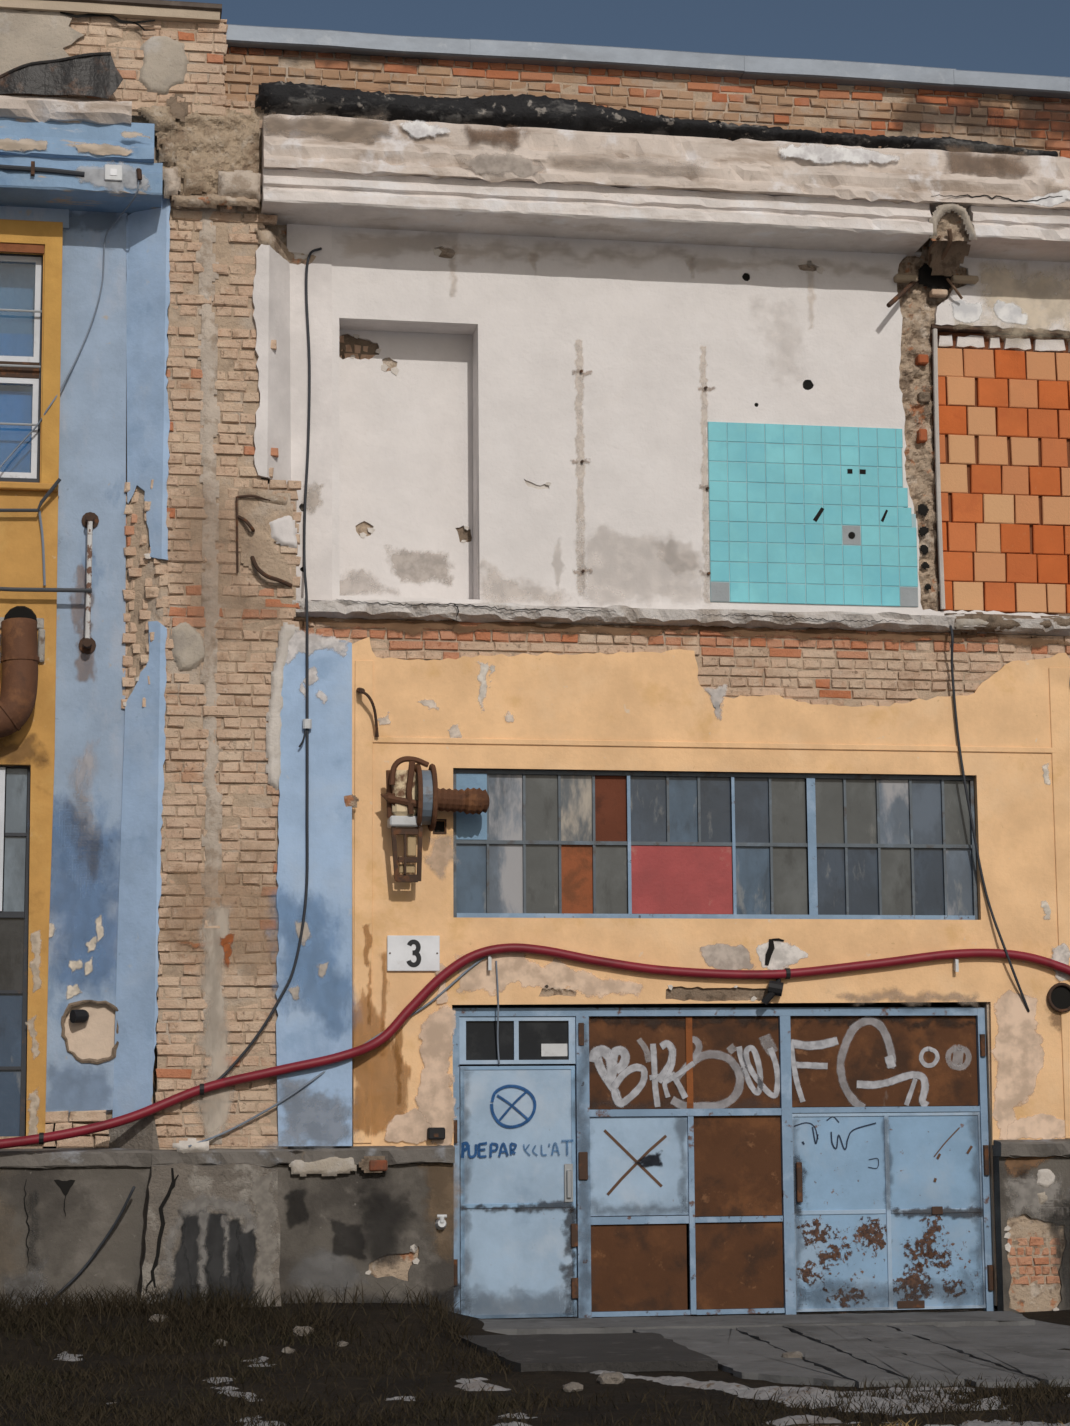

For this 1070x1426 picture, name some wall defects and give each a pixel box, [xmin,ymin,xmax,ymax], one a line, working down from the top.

spalling [123,487,205,707]
peeling [705,684,727,719]
peeling [295,922,311,946]
spalling [666,941,808,1002]
peeling [991,990,1065,1140]
peeling [251,953,643,1307]
crack [146,1168,179,1290]
water stain [142,1195,257,1309]
rust [797,1215,979,1314]
spalling [1004,1169,1066,1312]